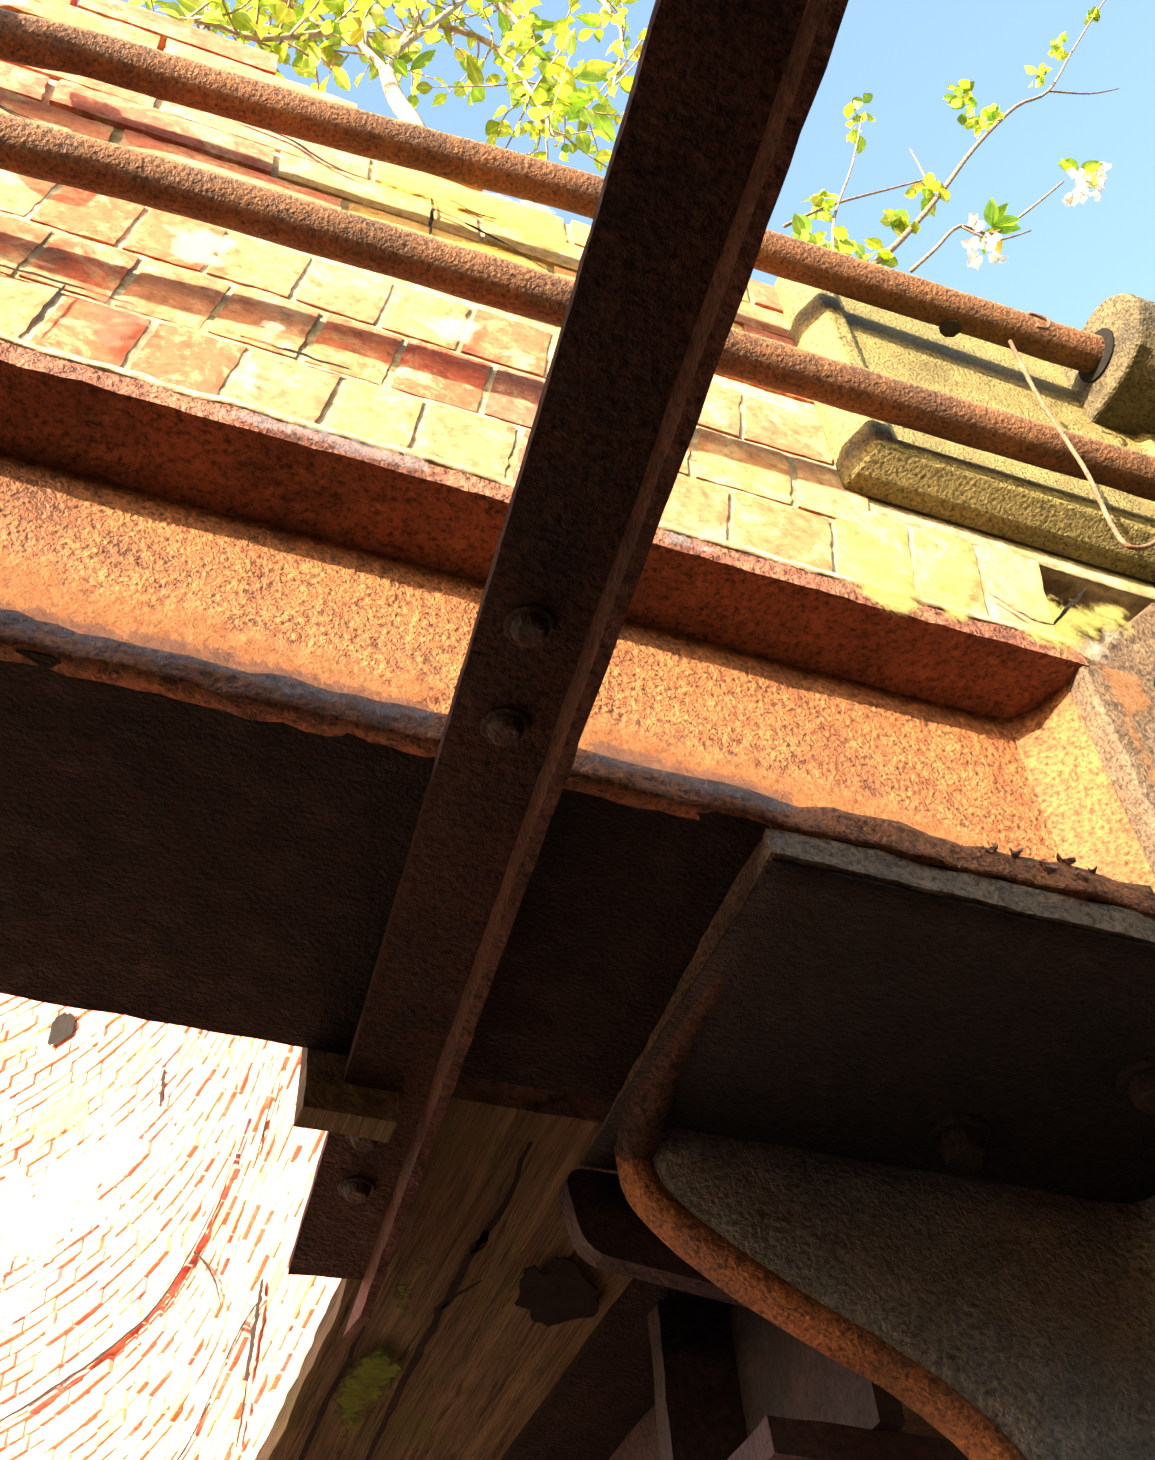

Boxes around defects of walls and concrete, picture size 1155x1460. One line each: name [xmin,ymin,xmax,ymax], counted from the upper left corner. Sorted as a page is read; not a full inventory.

rust [981,843,1024,858]
rust [1039,852,1098,883]
spalling [47,1011,76,1046]